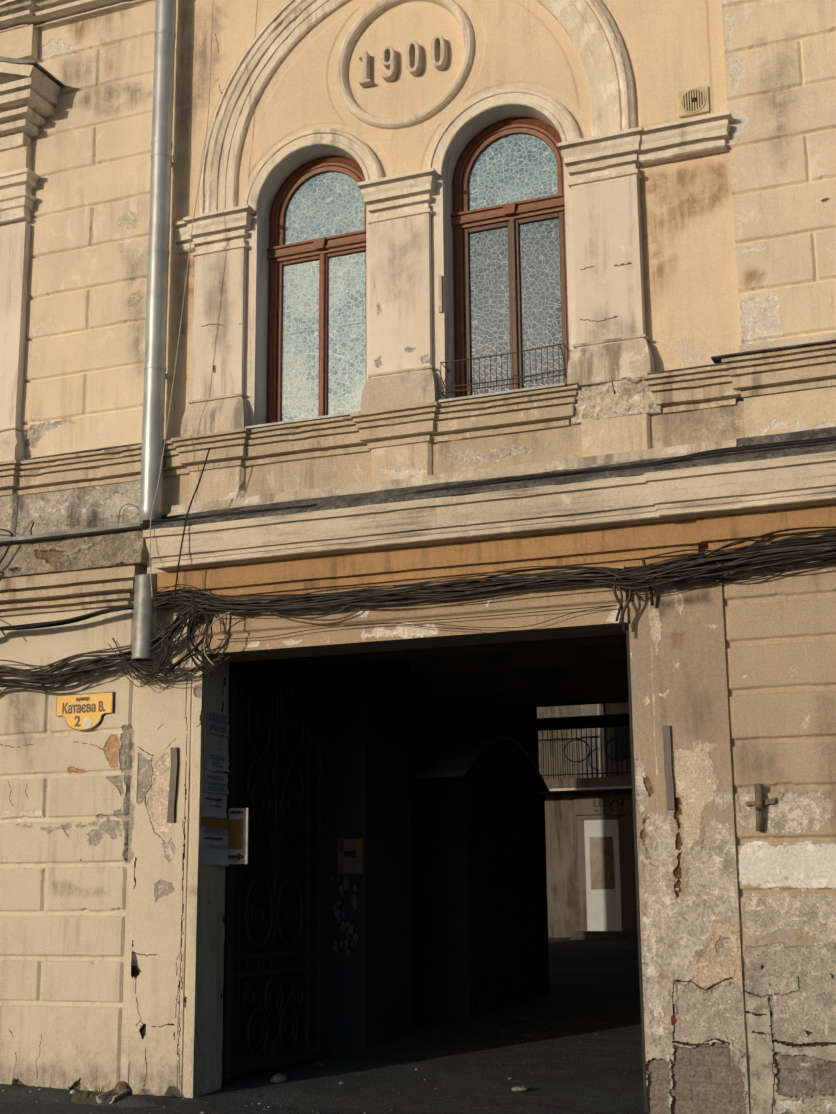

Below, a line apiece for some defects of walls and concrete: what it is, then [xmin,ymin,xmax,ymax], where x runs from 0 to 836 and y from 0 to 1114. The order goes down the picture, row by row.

peeling [739,294,784,345]
spalling [573,378,656,419]
spalling [20,488,140,536]
spalling [33,542,96,564]
peeling [350,605,439,641]
peeling [0,724,175,864]
peeling [153,879,175,902]
crack [128,677,201,1089]
spalling [634,740,836,1114]
crack [671,977,836,1114]